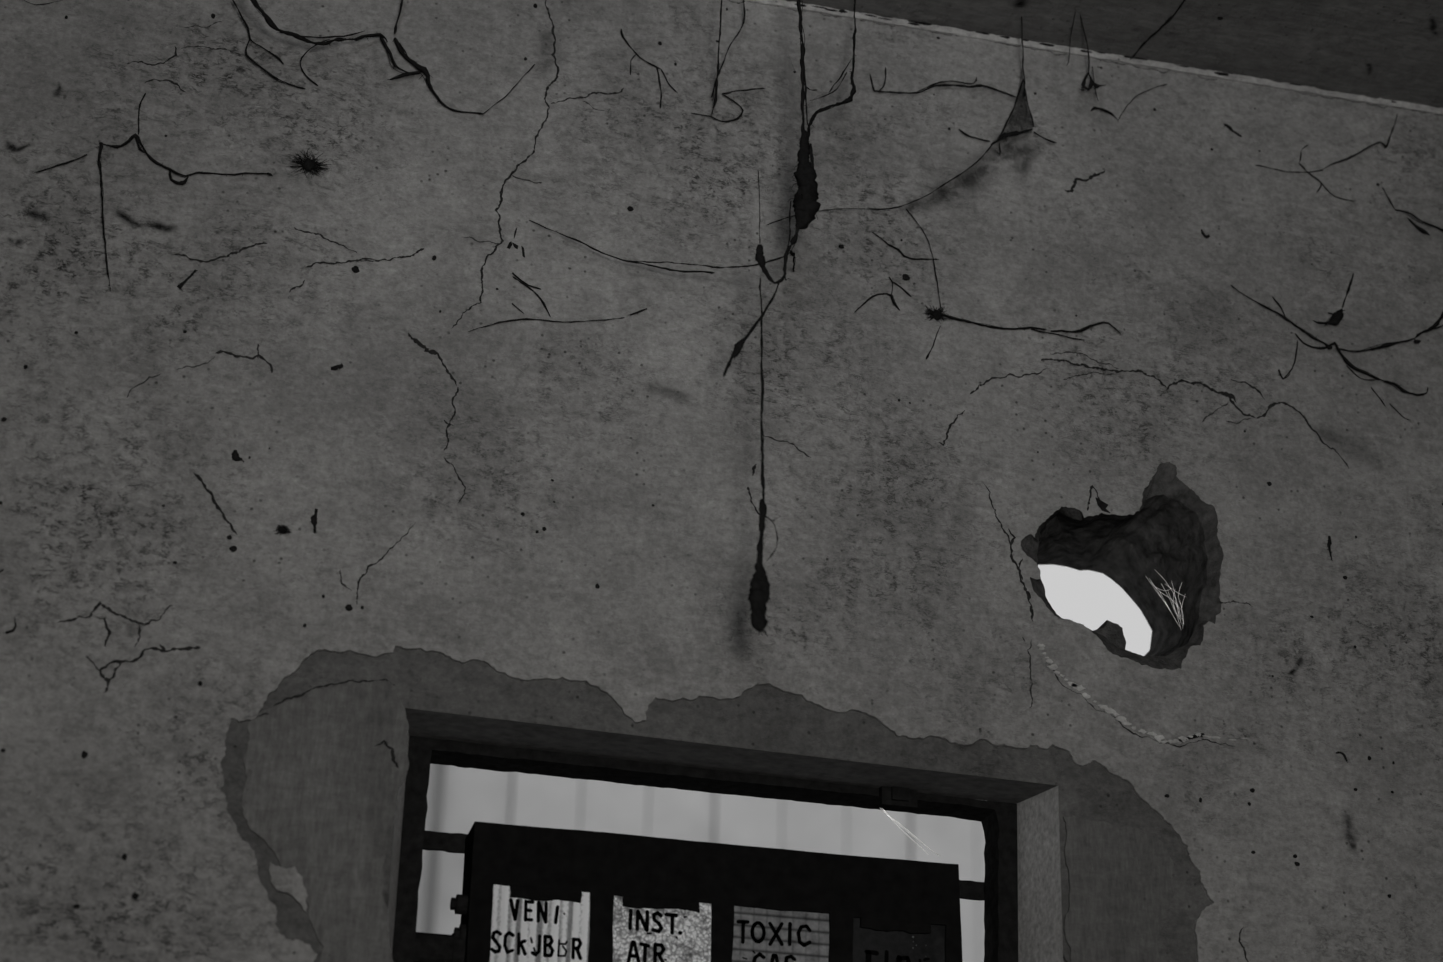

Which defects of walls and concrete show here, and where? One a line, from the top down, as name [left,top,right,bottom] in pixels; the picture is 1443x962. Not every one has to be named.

crack [127,21,241,92]
crack [995,42,1218,81]
crack [1065,171,1105,193]
crack [173,227,424,292]
crack [408,0,624,502]
hole [1021,462,1224,670]
spalling [221,647,1212,962]